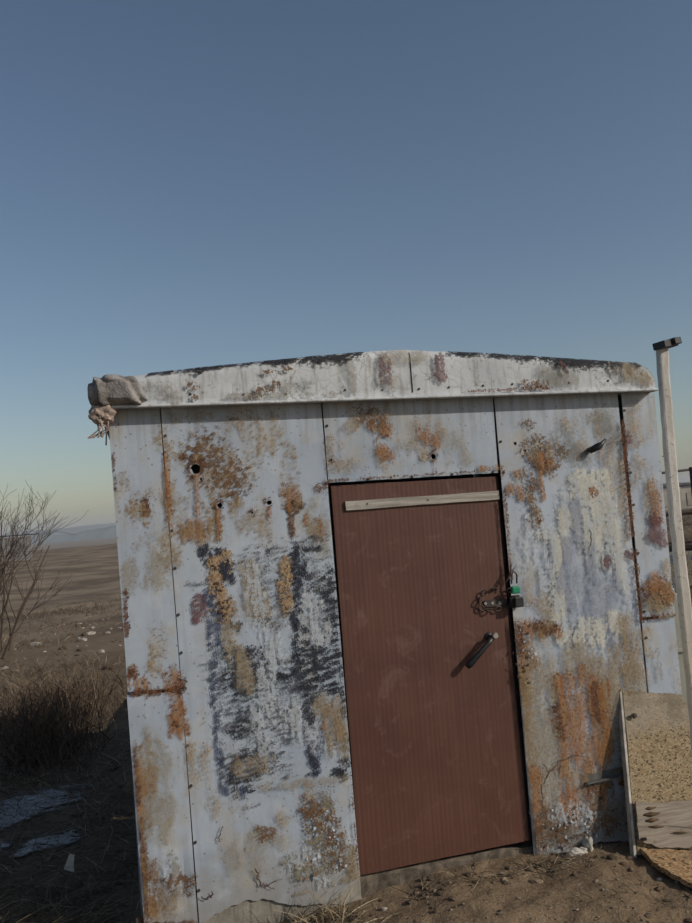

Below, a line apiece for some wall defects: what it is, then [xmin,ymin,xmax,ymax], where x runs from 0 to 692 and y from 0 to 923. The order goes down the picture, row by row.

rust [247,366,313,400]
rust [467,385,551,393]
rust [112,452,152,524]
rust [156,411,301,568]
rust [123,588,131,637]
peeling [205,549,295,625]
rust [312,399,676,854]
rust [128,641,212,923]
rust [253,813,289,844]